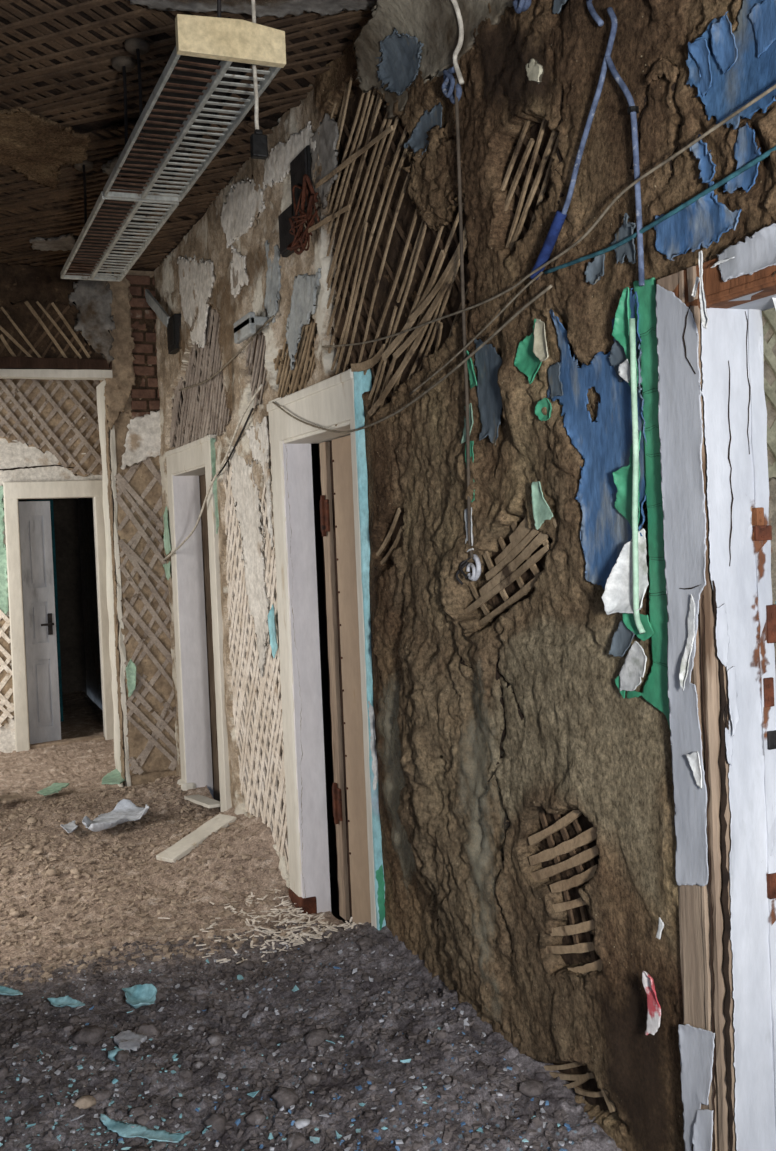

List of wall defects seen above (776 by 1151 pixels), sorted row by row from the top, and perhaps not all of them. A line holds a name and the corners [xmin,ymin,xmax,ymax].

spalling [246,27,469,416]
spalling [0,0,374,872]
peeling [368,701,378,791]
peeling [376,865,385,930]
crack [460,657,524,910]
peeling [461,0,776,1151]
rust [752,516,772,579]
rust [751,597,776,738]